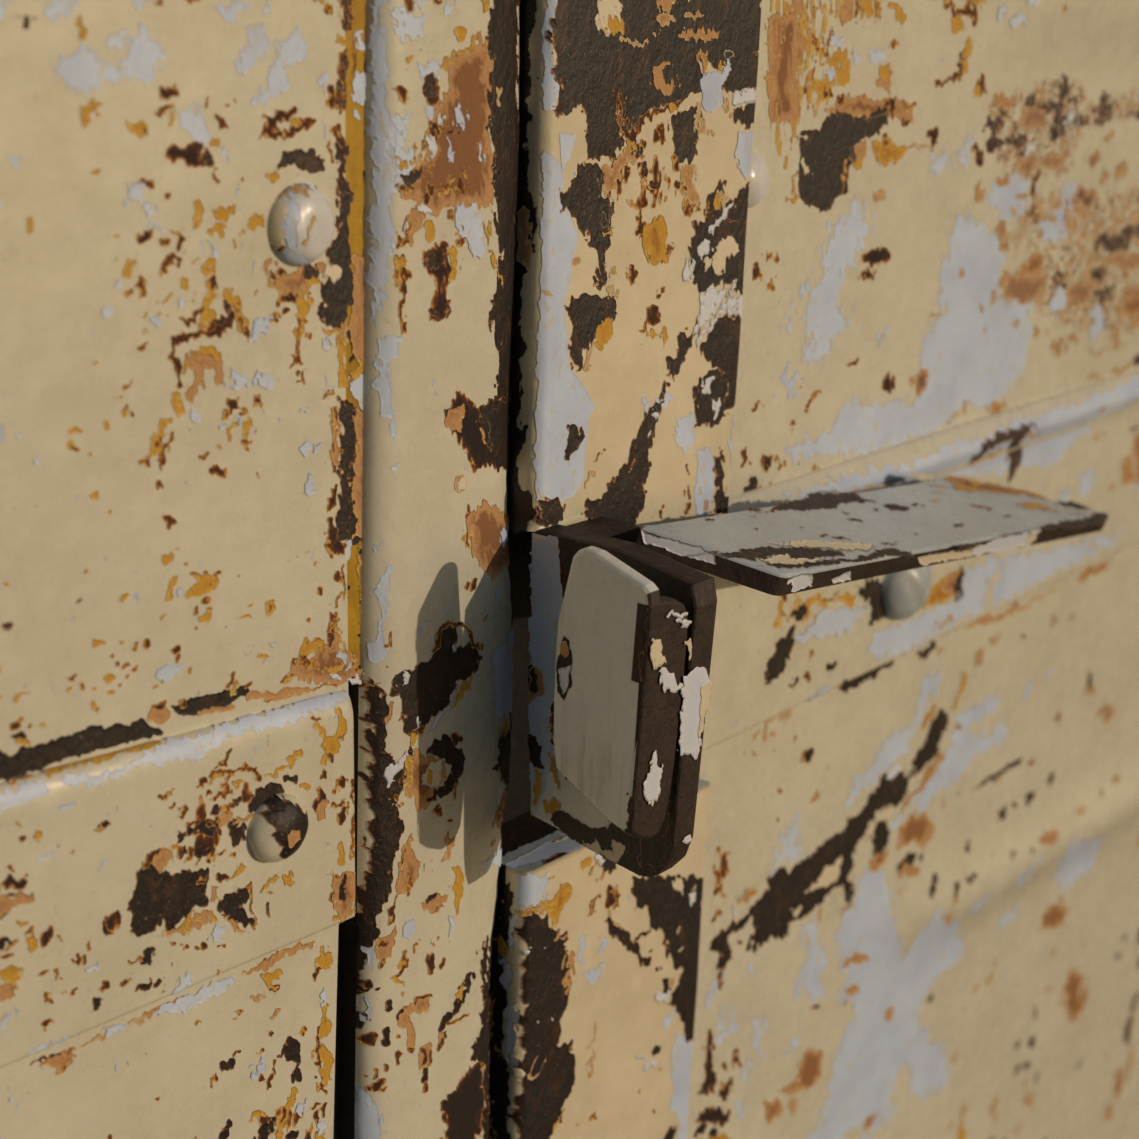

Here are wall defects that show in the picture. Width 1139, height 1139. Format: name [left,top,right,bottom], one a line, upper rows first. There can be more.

corrosion [393,0,537,535]
corrosion [560,92,702,297]
peeling [533,0,762,517]
corrosion [764,0,907,170]
peeling [773,30,917,399]
peeling [0,0,483,1030]
peeling [444,391,511,473]
peeling [28,852,315,1076]
corrosion [142,707,356,923]
corrosion [355,831,546,1139]
corrosion [694,1029,743,1139]
peeling [502,466,1127,1139]